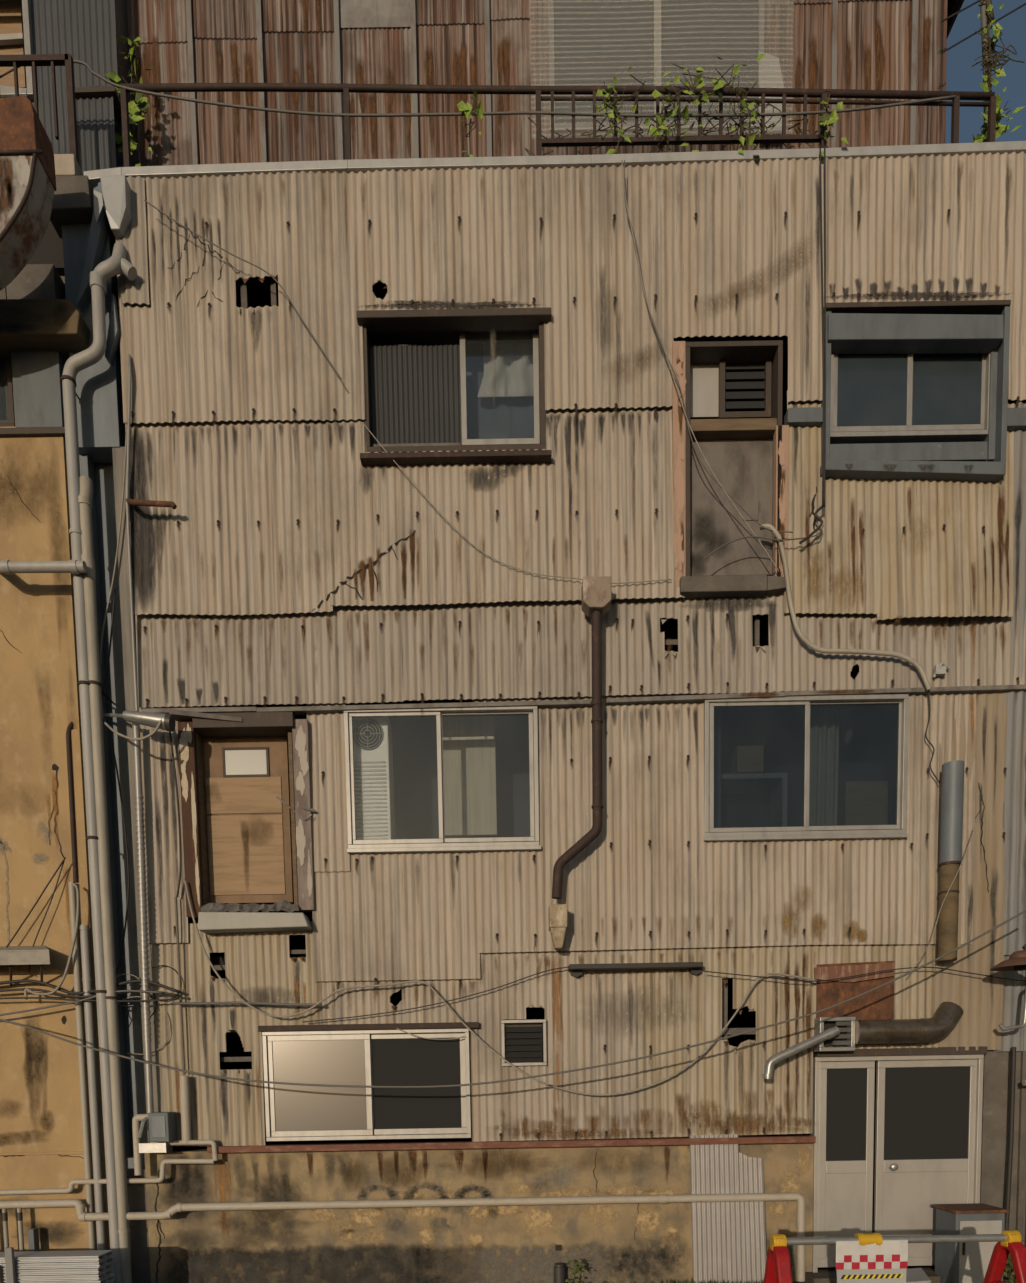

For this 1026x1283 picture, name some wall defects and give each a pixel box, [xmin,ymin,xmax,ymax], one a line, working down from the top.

corrosion [0,158,13,210]
corrosion [354,550,380,601]
corrosion [401,534,419,594]
corrosion [851,504,865,588]
corrosion [972,496,1009,601]
corrosion [327,612,398,649]
crack [48,767,64,858]
crack [0,837,12,943]
corrosion [534,934,563,1039]
damp [168,1164,685,1283]
damp [348,1154,570,1229]